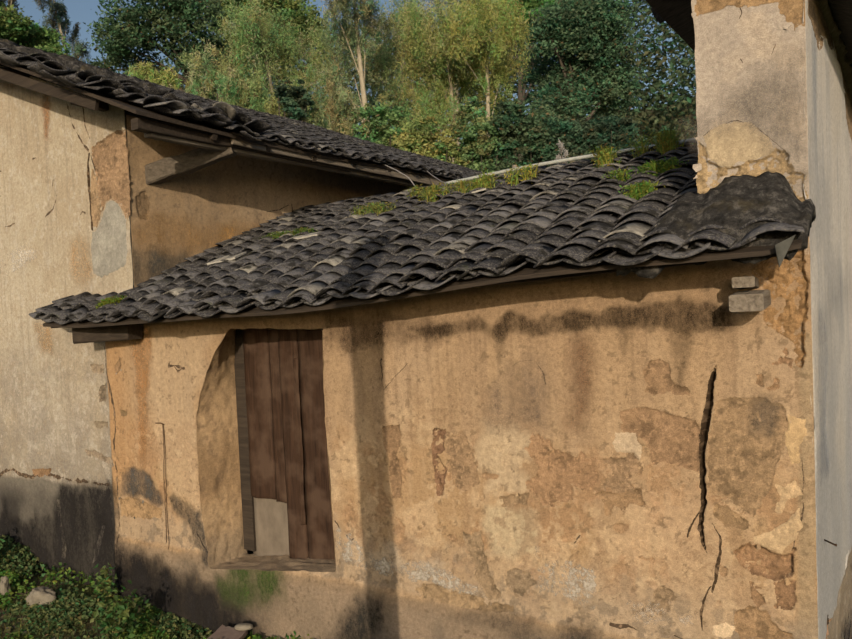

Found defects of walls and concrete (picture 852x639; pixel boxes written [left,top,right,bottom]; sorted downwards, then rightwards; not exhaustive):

peeling [691,0,852,140]
crack [67,104,96,231]
peeling [90,126,151,229]
peeling [693,137,809,202]
water stain [406,325,457,338]
water stain [492,299,731,339]
peeling [752,250,810,369]
water stain [0,467,244,634]
water stain [340,601,382,639]
peeling [496,357,792,533]
crack [687,366,722,631]
peeling [733,542,797,639]